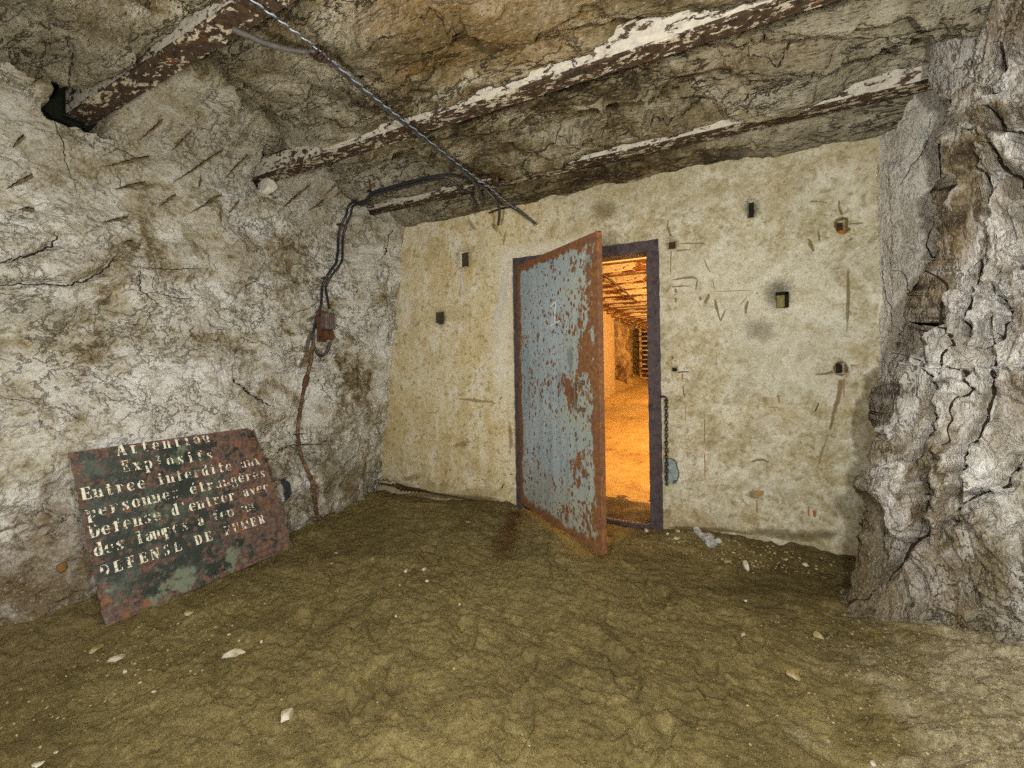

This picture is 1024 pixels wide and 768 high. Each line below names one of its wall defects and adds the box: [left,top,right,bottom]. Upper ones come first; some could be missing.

crack [0,232,118,287]
crack [232,295,320,407]